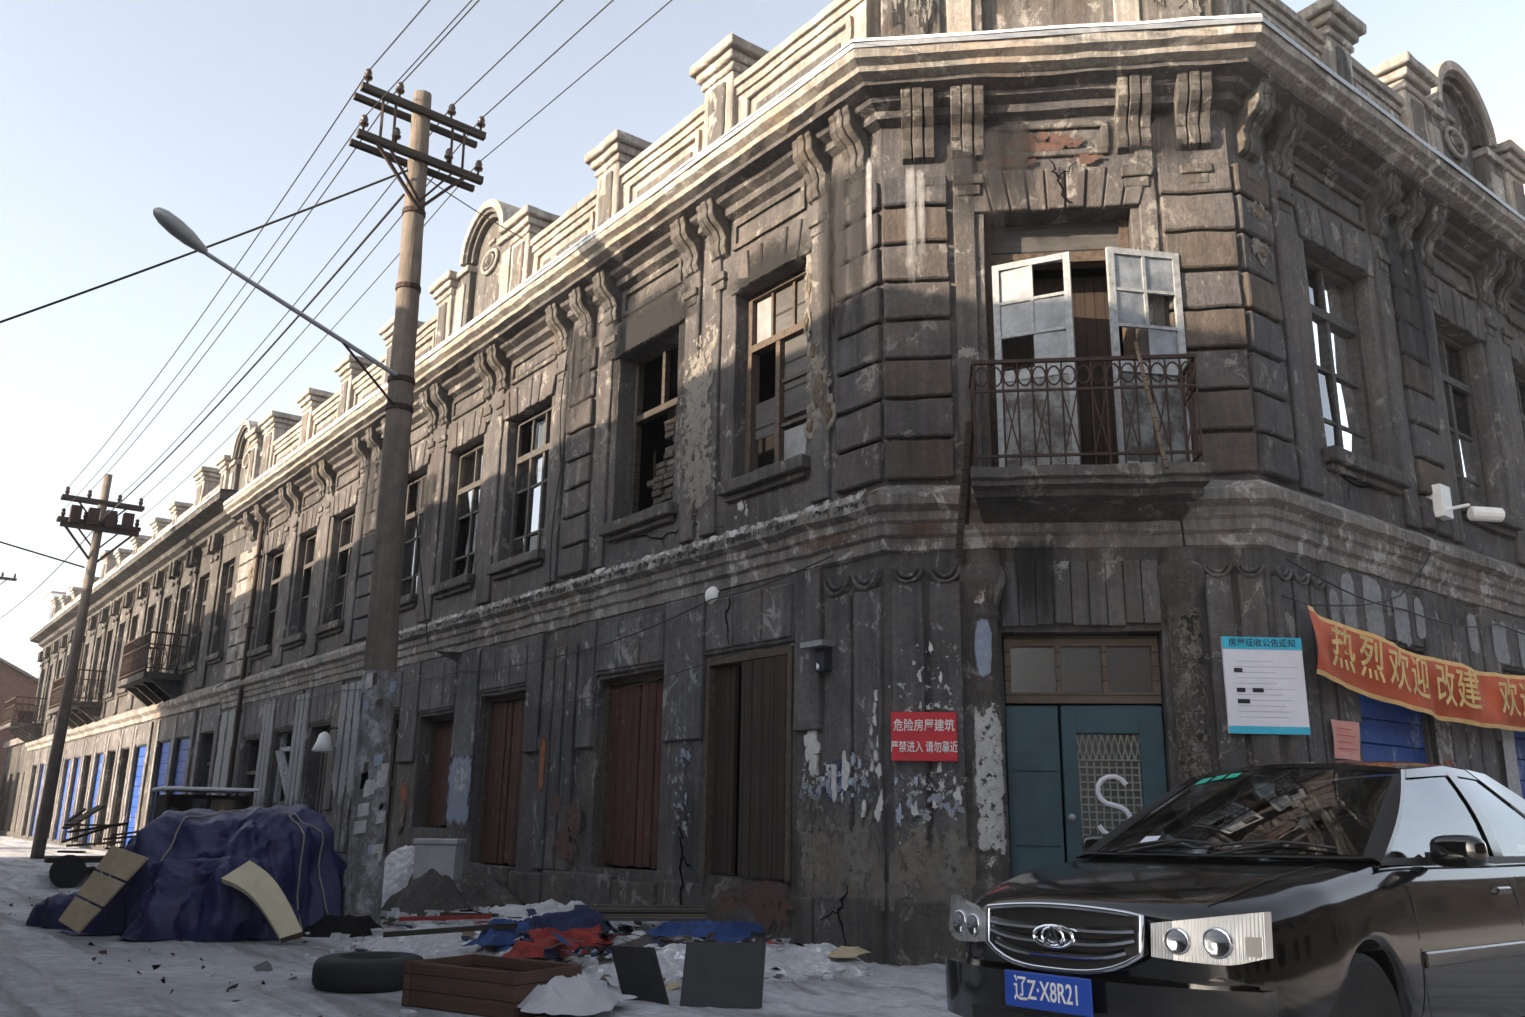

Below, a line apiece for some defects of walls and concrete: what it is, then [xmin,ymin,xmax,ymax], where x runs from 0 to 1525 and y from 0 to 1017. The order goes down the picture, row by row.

crack [1049,159,1076,203]
peeling [358,673,397,711]
flaking render [798,586,1009,911]
peeling [346,754,389,862]
crack [678,827,691,905]